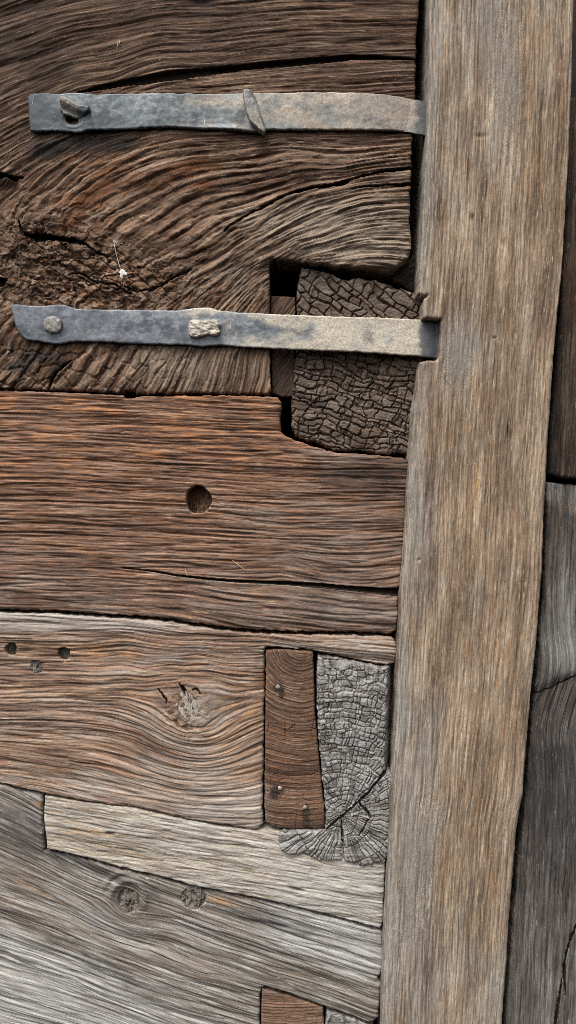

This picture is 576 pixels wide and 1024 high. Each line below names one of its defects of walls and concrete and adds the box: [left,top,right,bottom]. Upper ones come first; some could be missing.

crack [77,55,418,93]
crack [224,167,419,232]
crack [19,221,192,294]
crack [126,568,398,596]